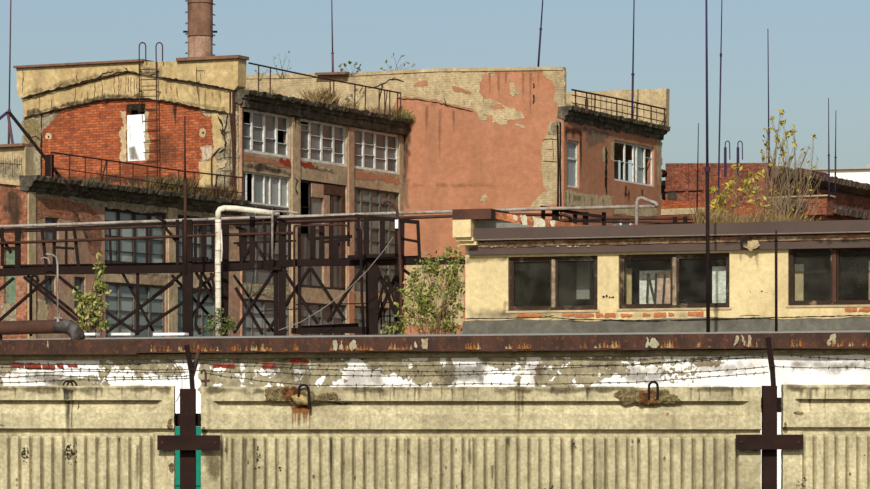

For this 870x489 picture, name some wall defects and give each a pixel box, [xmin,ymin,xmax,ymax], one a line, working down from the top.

crack [0,65,232,179]
spalling [215,113,334,188]
peeling [246,71,525,128]
peeling [530,120,663,216]
peeling [0,359,183,386]
peeling [363,357,458,387]
peeling [478,357,724,405]
corrosion [292,404,311,422]